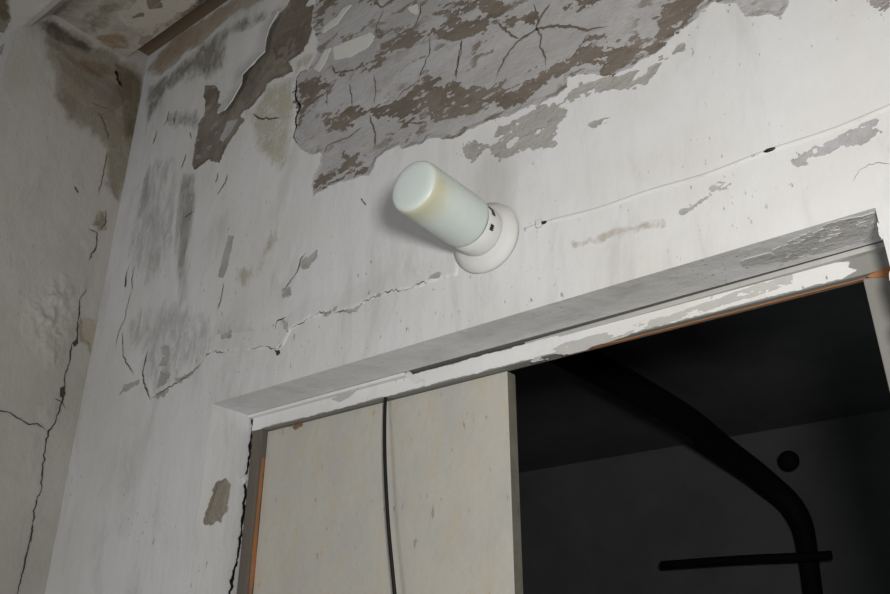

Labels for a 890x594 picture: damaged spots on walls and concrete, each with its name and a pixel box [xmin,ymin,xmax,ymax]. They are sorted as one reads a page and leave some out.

flaking render [869,0,890,12]
crack [75,102,109,261]
flaking render [192,0,789,196]
flaking render [791,118,883,167]
crack [115,267,201,399]
crack [275,247,319,328]
flaking render [530,274,793,363]
crack [0,286,87,594]
spalling [203,478,231,526]
crack [228,419,253,594]